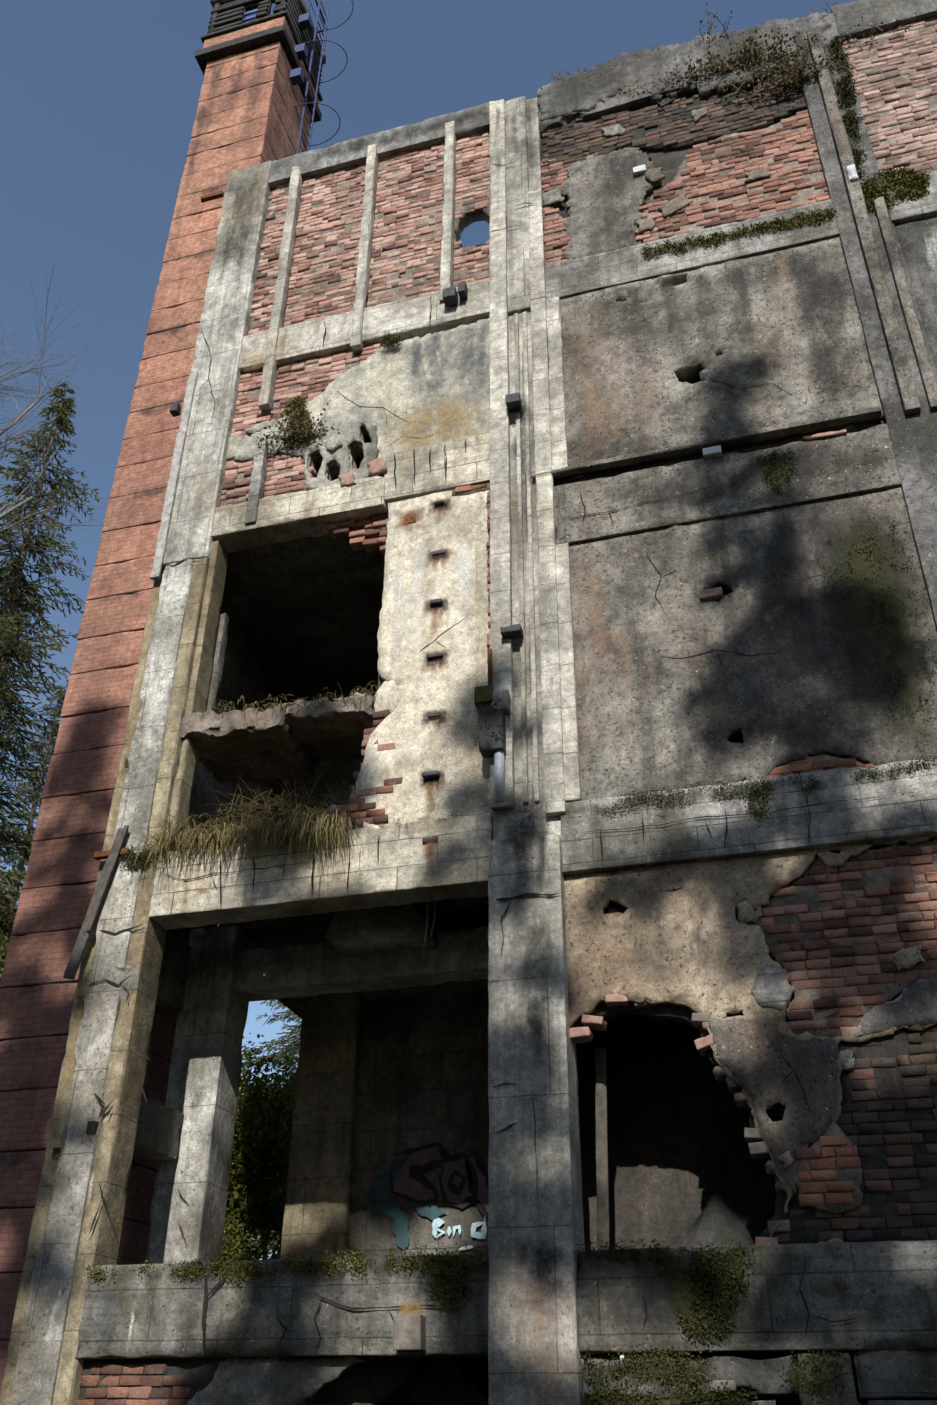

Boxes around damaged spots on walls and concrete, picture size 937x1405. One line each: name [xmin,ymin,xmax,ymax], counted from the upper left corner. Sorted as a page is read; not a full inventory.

spalling [540,69,830,266]
spalling [231,341,391,437]
spalling [220,422,388,507]
crack [647,555,675,613]
crack [663,649,787,671]
spalling [322,786,388,833]
spalling [604,903,627,918]
spalling [570,994,654,1044]
spalling [692,1013,747,1107]
spalling [735,839,937,1245]
crack [201,1270,230,1358]
crack [277,1292,449,1358]